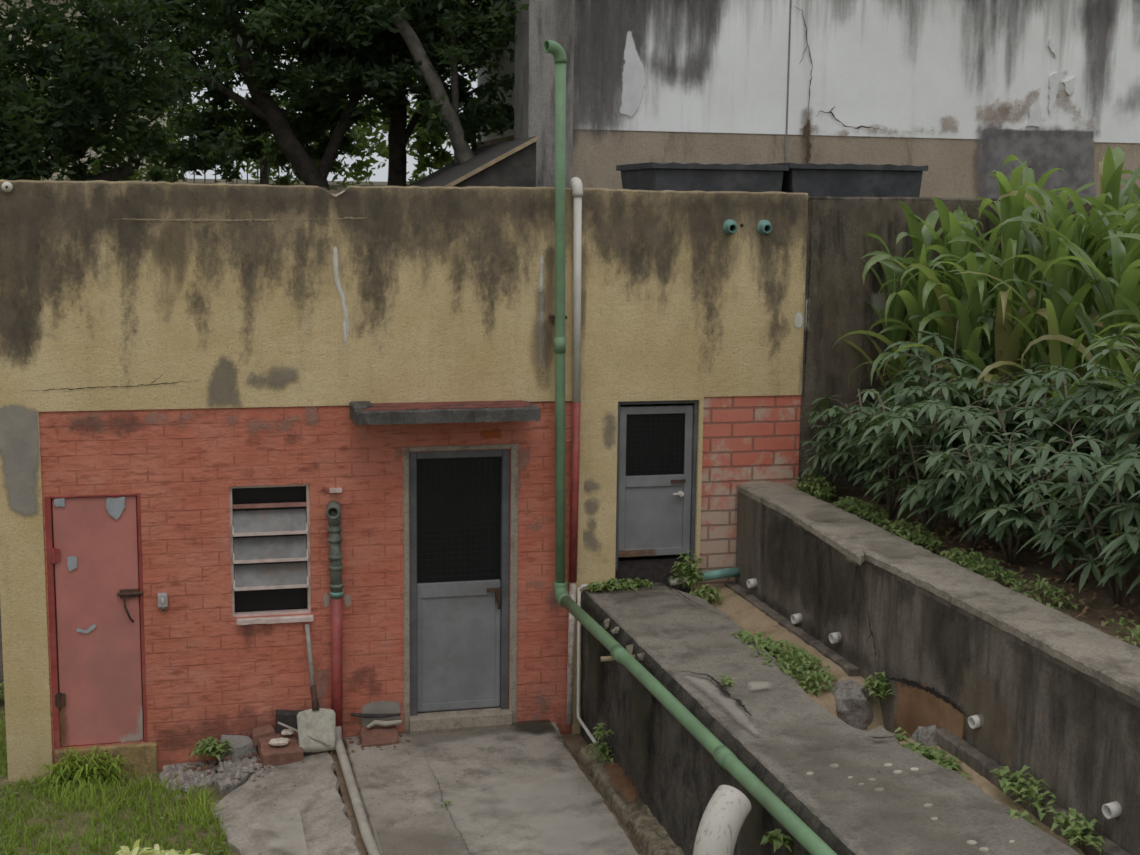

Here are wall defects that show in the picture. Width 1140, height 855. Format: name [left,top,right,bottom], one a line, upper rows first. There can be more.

peeling [620,31,646,117]
damp [573,0,720,137]
crack [796,7,881,163]
damp [979,0,1001,79]
peeling [977,72,1075,128]
damp [1086,0,1117,109]
damp [0,182,554,357]
damp [585,126,1022,378]
crack [26,372,198,391]
peeling [106,497,125,520]
peeling [67,556,78,571]
crack [425,756,472,855]